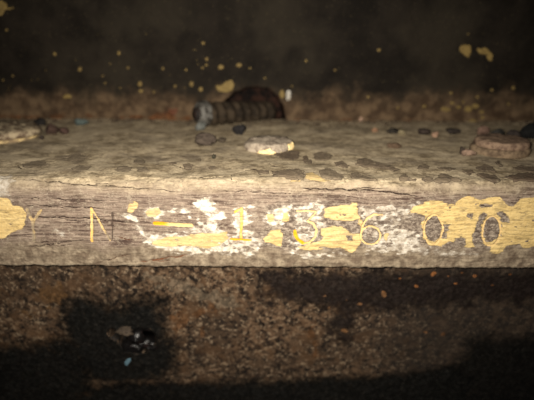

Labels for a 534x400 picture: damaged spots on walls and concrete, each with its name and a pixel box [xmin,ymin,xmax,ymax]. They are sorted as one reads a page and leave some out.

crack [17,166,175,192]
crack [297,180,417,197]